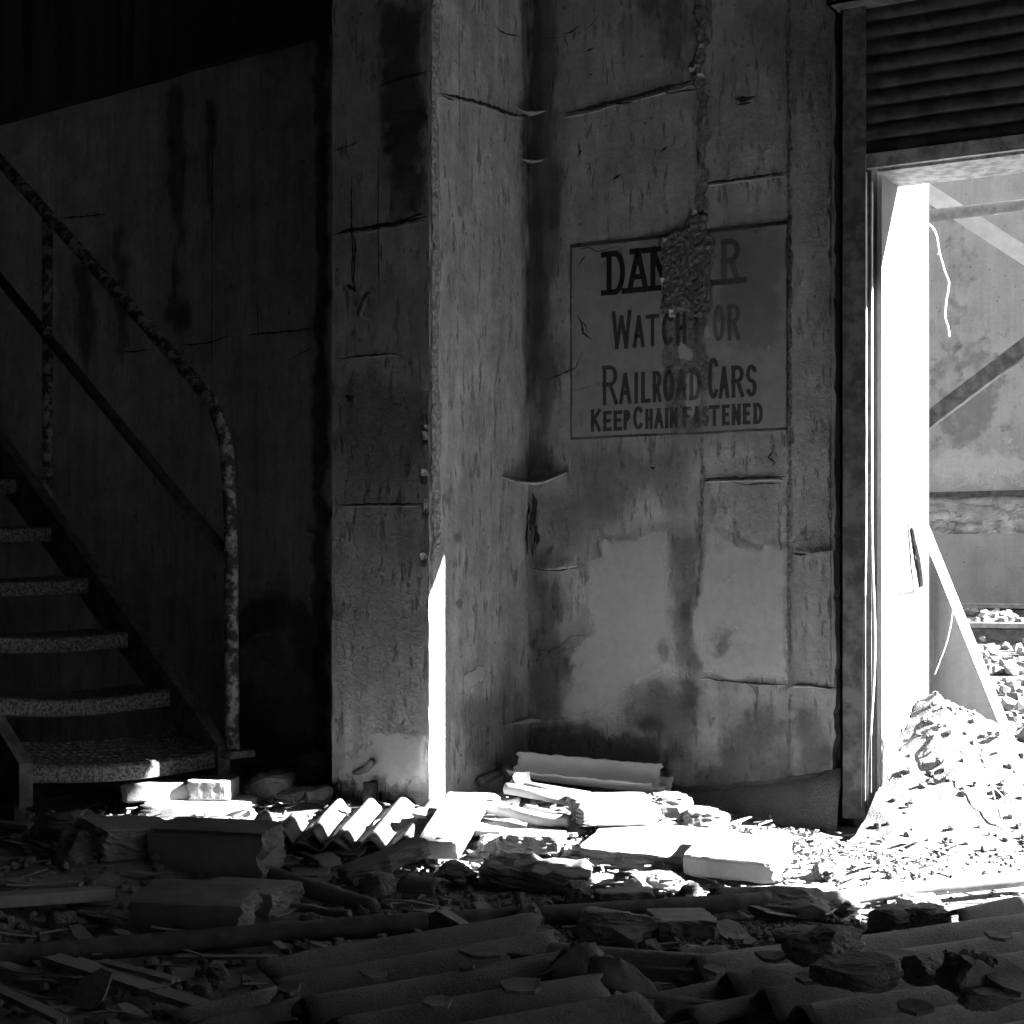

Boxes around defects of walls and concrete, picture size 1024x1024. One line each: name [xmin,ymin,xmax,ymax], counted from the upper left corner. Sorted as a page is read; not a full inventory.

crack [437,11,529,120]
crack [565,80,696,118]
leakage [521,0,559,430]
leakage [530,532,698,778]
leakage [542,782,649,794]
leakage [695,712,829,792]